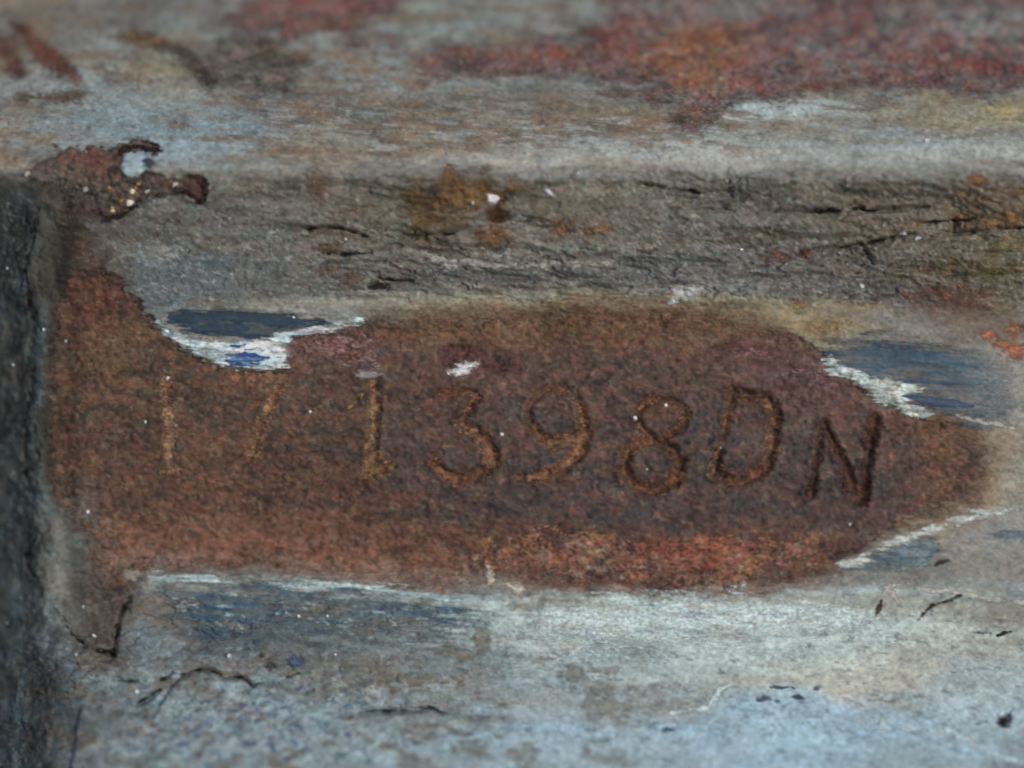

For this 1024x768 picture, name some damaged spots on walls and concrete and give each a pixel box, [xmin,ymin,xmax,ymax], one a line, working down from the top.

rust [414,0,1024,134]
peeling [156,309,364,371]
peeling [821,331,1016,430]
rust [47,270,985,603]
crack [67,597,130,658]